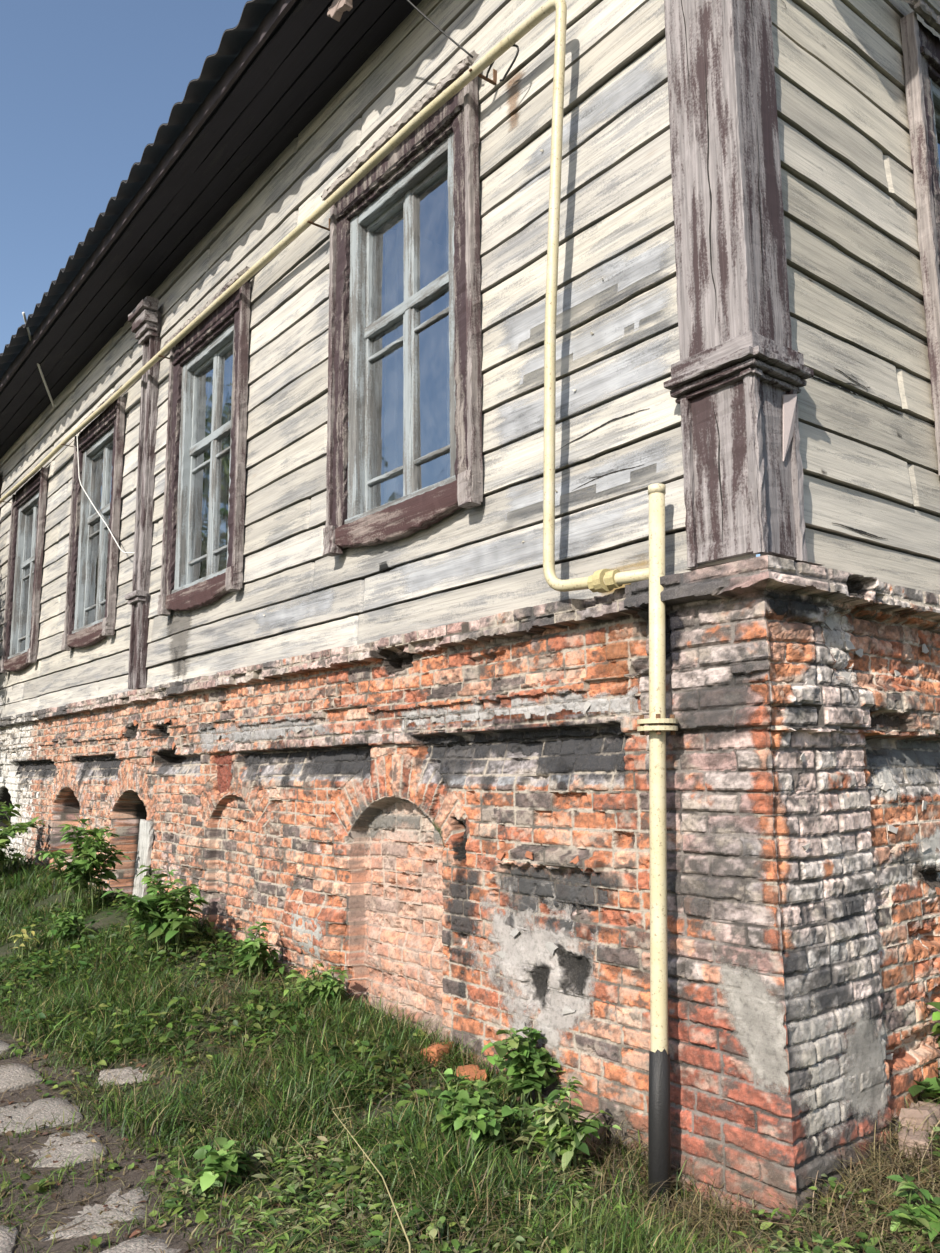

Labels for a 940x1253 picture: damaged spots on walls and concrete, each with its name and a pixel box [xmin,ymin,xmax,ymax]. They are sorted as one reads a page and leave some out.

crack [833,523,886,539]
spalling [369,646,414,675]
spalling [120,718,186,767]
peeling [197,716,330,752]
peeling [401,687,639,734]
spalling [747,574,940,956]
peeling [0,749,20,858]
spalling [451,818,467,861]
peeling [472,881,597,1064]